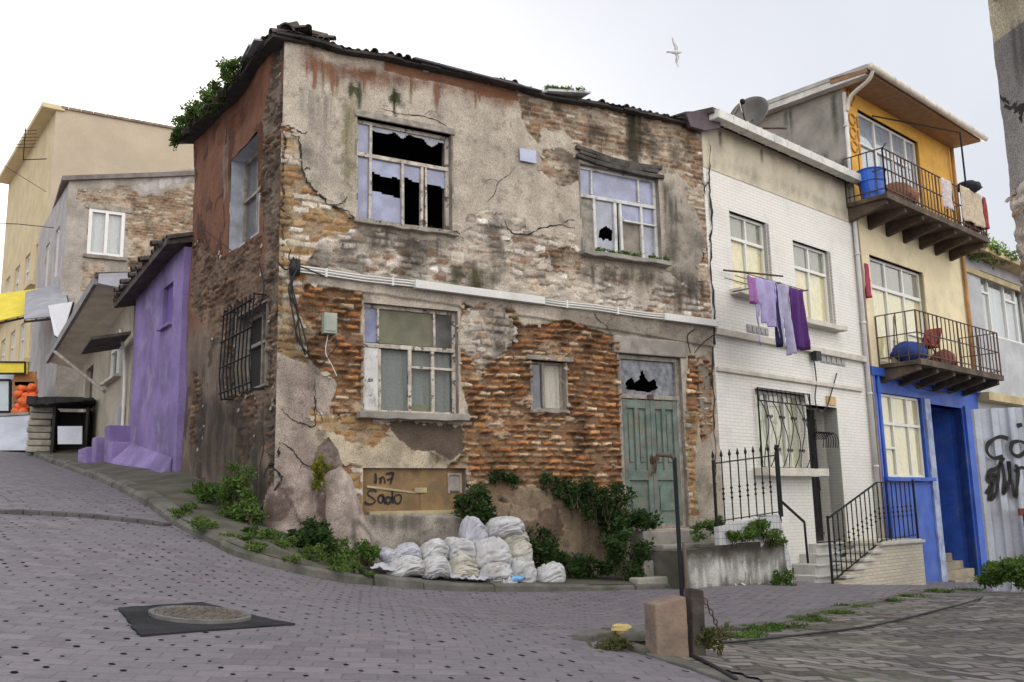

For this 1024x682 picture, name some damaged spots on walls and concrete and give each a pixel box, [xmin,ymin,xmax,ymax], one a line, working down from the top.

rust [306,55,446,108]
water stain [389,89,401,113]
crack [282,125,361,226]
crack [486,164,574,241]
flaking render [76,45,713,521]
crack [259,378,323,500]